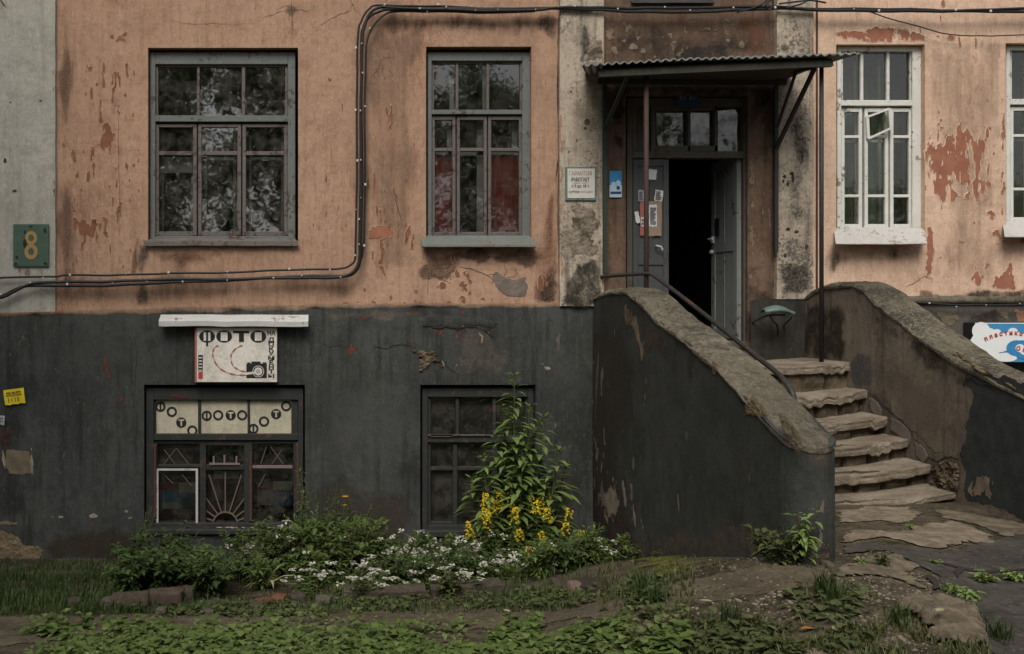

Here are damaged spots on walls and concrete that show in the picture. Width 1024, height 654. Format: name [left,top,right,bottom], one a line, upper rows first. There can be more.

peeling [835,26,978,49]
peeling [63,59,139,263]
peeling [923,98,1006,245]
peeling [366,172,415,277]
spalling [547,204,601,277]
peeling [970,260,1016,291]
spalling [408,252,557,371]
peeling [614,304,645,361]
leakage [805,305,844,359]
spalling [929,459,993,499]
spalling [0,521,44,559]